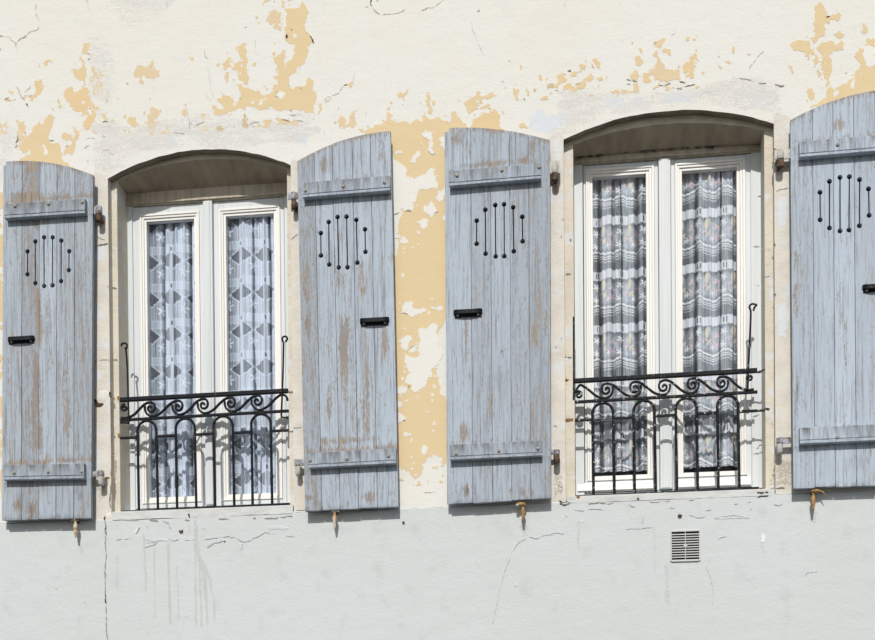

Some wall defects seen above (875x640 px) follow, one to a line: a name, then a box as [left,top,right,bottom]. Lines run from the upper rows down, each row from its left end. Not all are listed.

peeling [0,43,172,168]
peeling [201,0,331,132]
peeling [505,59,607,101]
peeling [611,36,705,96]
peeling [790,2,875,108]
peeling [334,89,504,486]
crack [104,449,296,640]
crack [492,485,784,623]